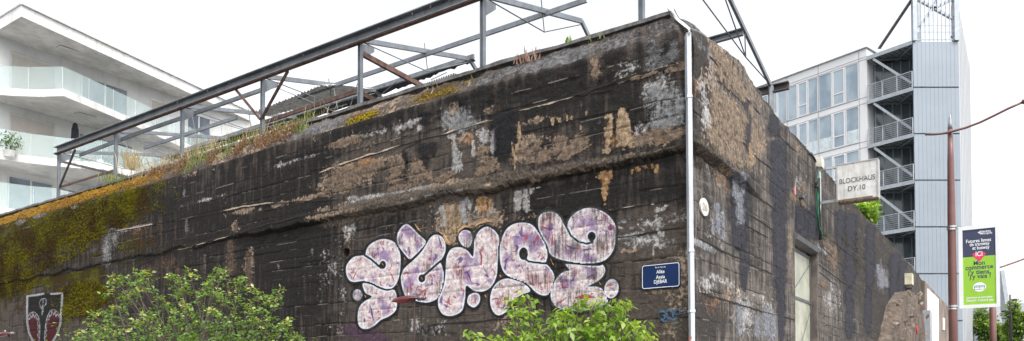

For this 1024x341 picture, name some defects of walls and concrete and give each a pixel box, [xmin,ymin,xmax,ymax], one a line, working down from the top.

leakage [347,101,519,200]
spalling [321,45,765,229]
leakage [644,86,685,130]
leakage [743,100,751,153]
crack [2,199,362,284]
leakage [711,169,751,291]
leakage [735,114,818,341]
leakage [836,211,906,339]